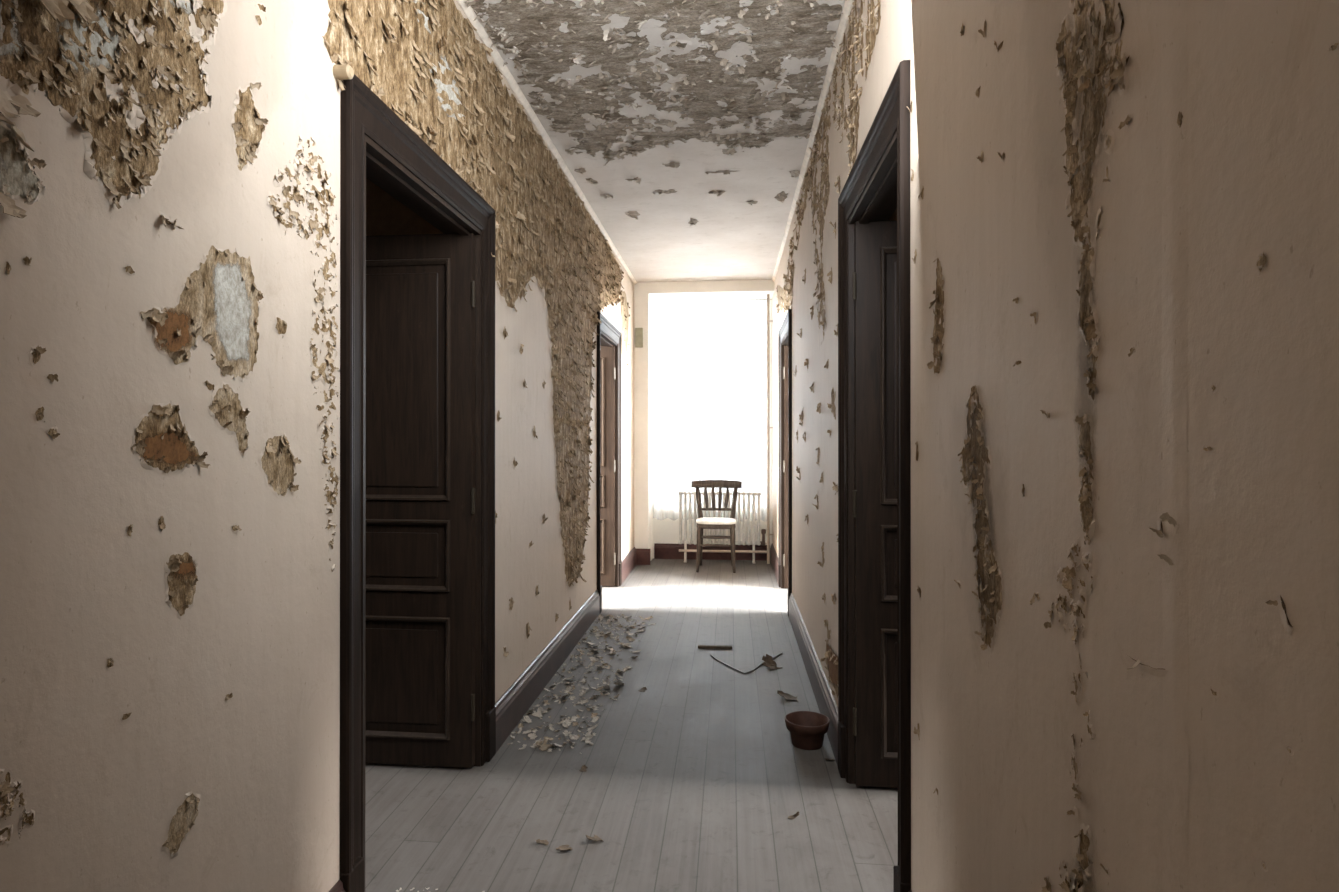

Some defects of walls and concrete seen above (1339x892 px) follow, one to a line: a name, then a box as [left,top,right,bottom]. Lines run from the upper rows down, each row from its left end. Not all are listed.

peeling [255,2,267,28]
peeling [231,82,268,173]
peeling [5,255,32,276]
peeling [28,345,58,384]
peeling [130,242,301,499]
peeling [266,136,340,572]
peeling [319,0,886,624]
peeling [33,405,60,441]
peeling [1030,0,1132,892]
peeling [157,515,166,533]
peeling [954,382,1004,653]
peeling [0,769,35,848]